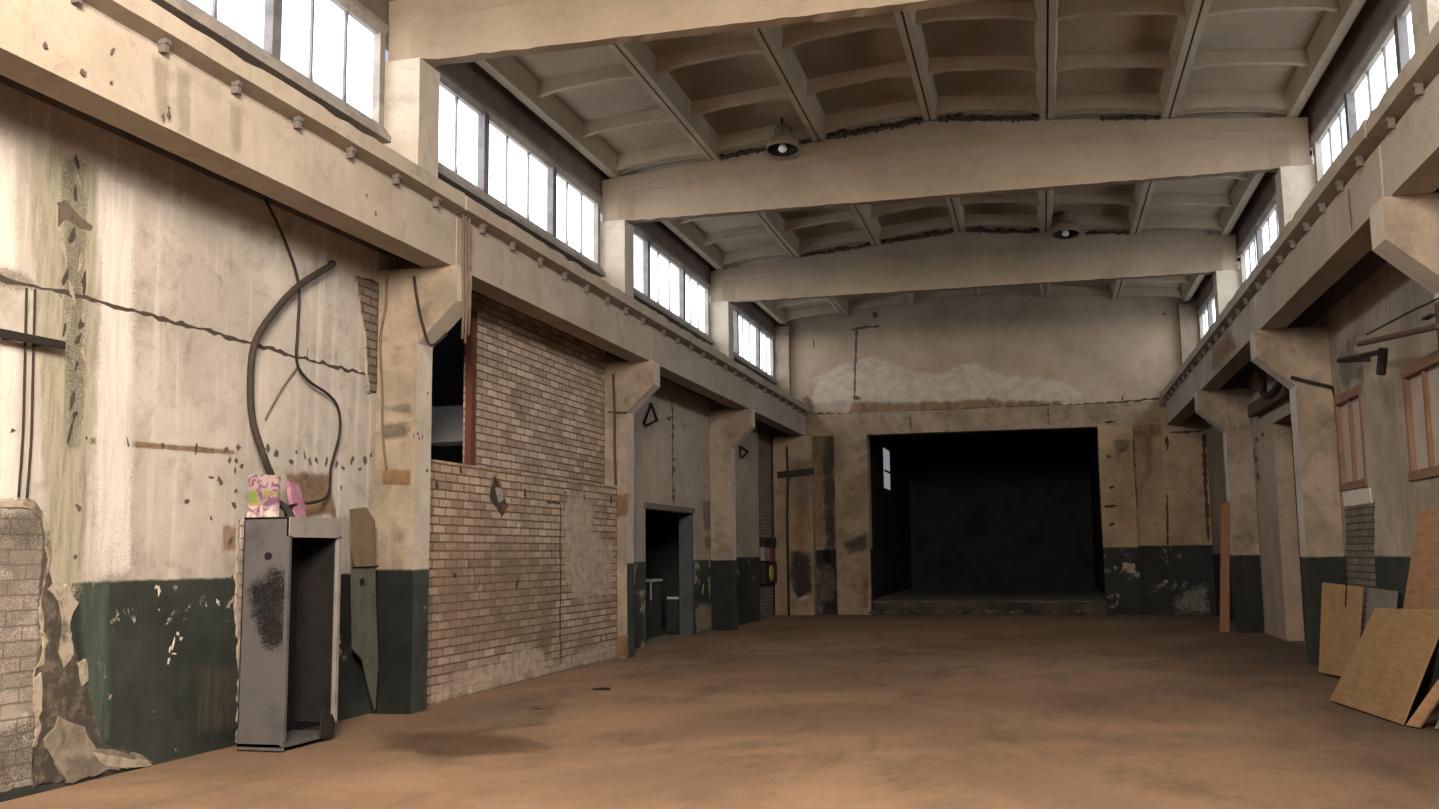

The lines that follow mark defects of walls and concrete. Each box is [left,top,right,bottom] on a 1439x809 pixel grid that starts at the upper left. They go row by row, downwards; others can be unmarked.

crack [0,267,367,388]
damp [789,355,1085,613]
peeling [1114,562,1136,573]
flaking render [1342,487,1376,637]
flaking render [0,498,154,795]